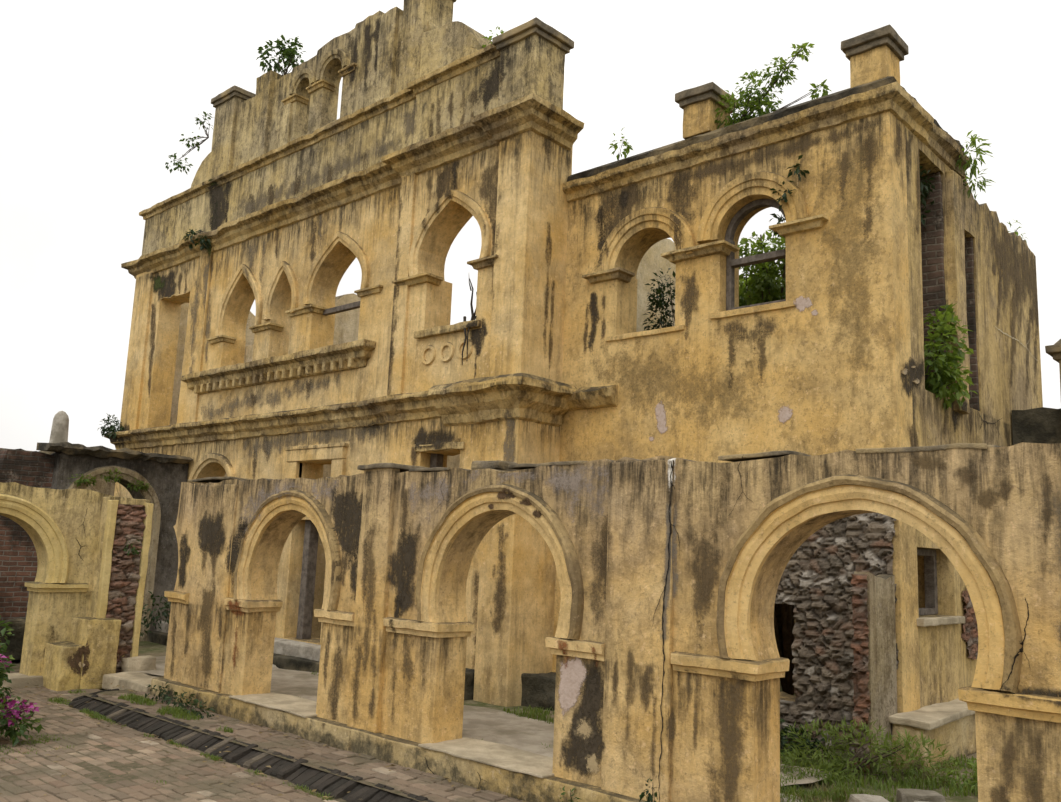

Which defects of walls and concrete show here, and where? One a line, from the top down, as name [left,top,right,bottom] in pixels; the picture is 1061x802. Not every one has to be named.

water stain [594,182,639,264]
water stain [666,118,881,361]
water stain [583,293,605,351]
peeling [649,401,667,441]
water stain [606,311,774,422]
peeling [794,296,818,315]
water stain [171,483,295,697]
water stain [312,479,448,726]
water stain [492,525,508,632]
crack [652,462,680,802]
crack [1000,599,1030,690]
flaking render [559,657,605,775]